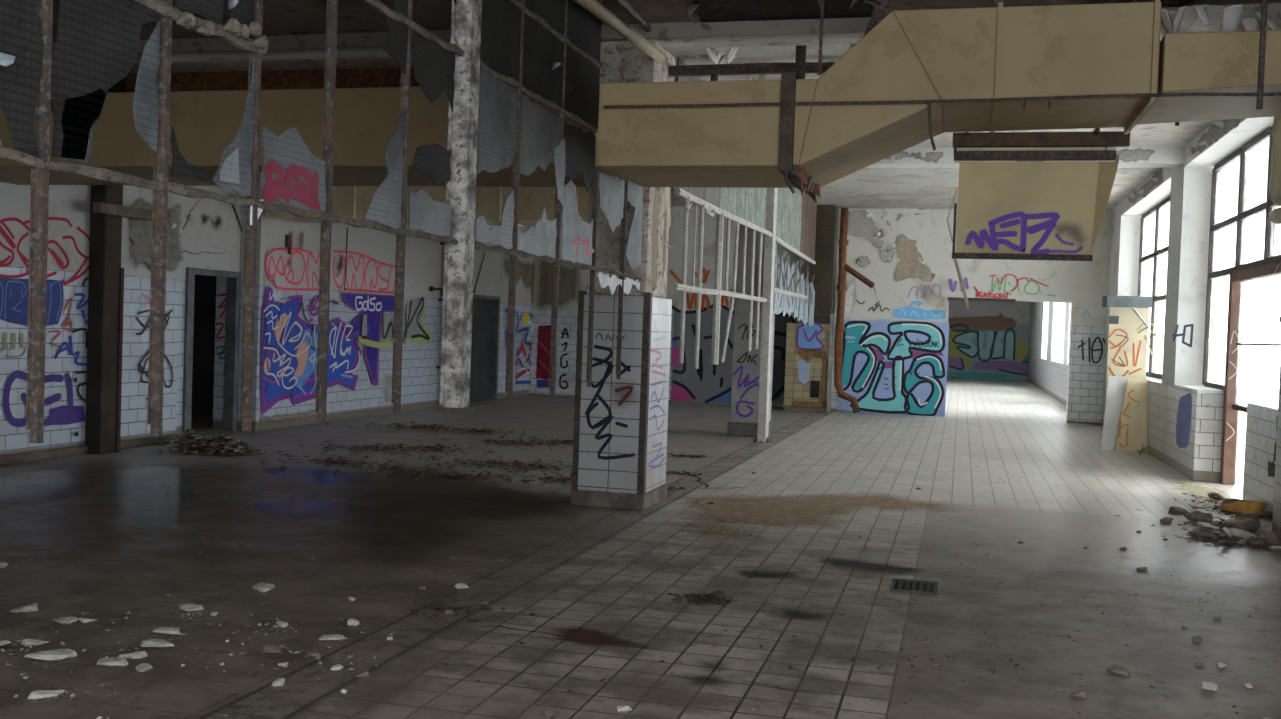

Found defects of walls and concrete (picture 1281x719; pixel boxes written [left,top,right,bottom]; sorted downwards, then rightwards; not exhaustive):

peeling [130,199,184,271]
peeling [847,208,935,281]